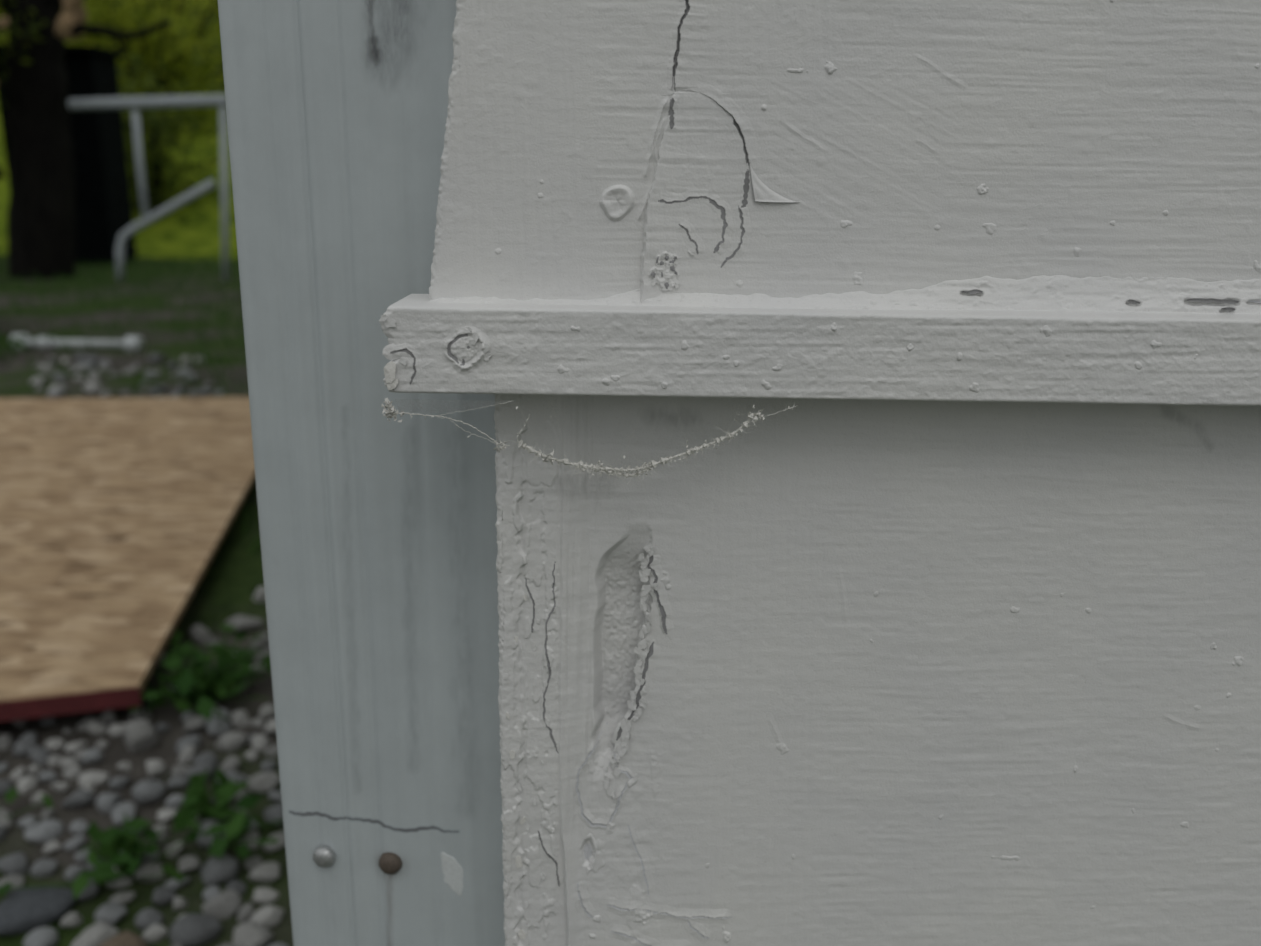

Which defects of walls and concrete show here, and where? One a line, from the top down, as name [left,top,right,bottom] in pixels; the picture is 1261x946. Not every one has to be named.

crack [652,0,761,274]
peeling [593,534,675,803]
crack [288,809,461,834]